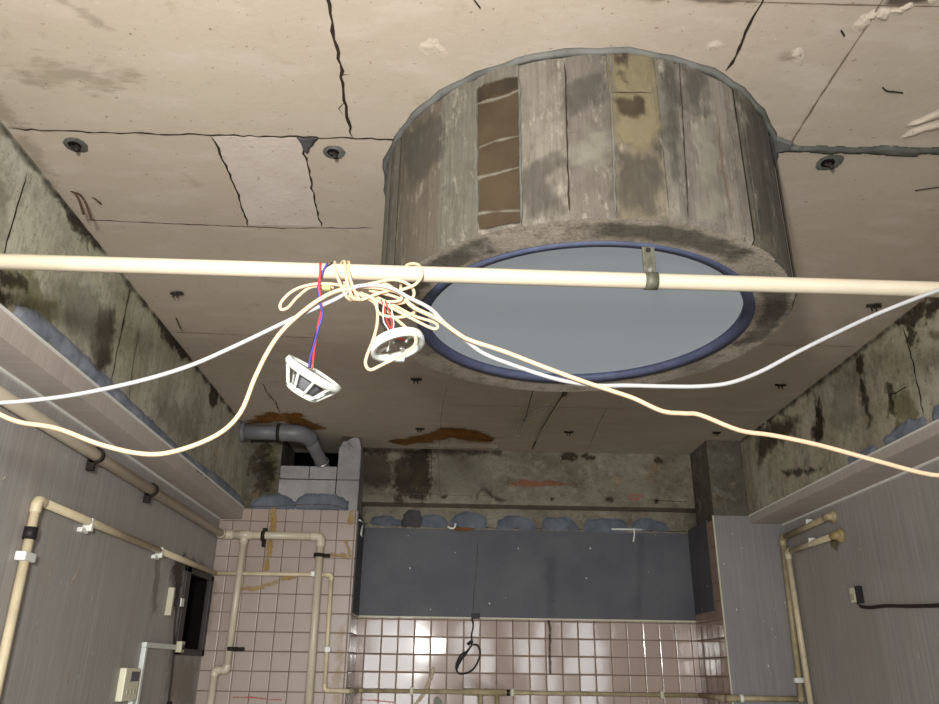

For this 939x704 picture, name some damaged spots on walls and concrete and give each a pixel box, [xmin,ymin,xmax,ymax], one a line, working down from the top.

crack [725,0,764,71]
flaking render [852,0,939,32]
crack [792,0,883,141]
crack [15,0,393,229]
flaking render [858,108,939,157]
water stain [896,297,939,346]
rust [247,412,325,430]
rust [390,427,494,445]
water stain [757,417,798,461]
water stain [811,399,824,442]
water stain [363,440,502,503]
rust [265,508,276,571]